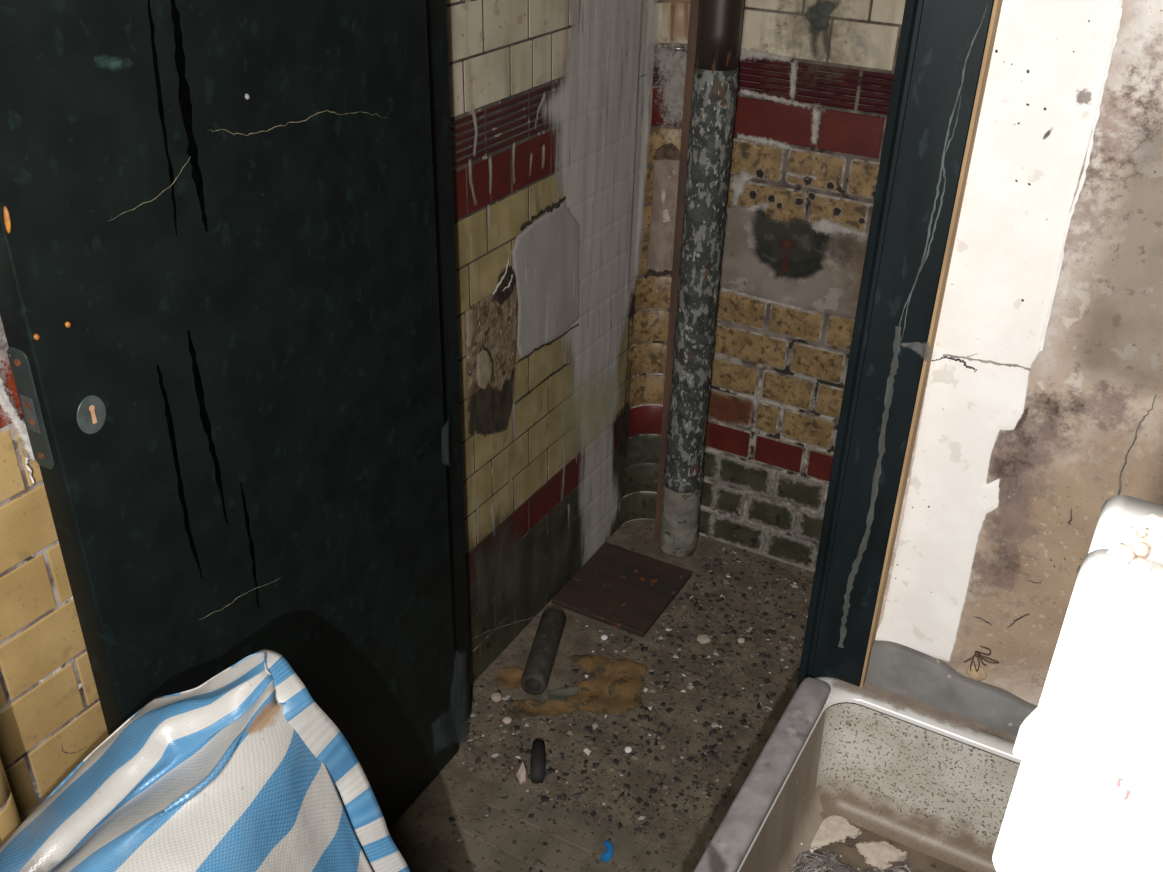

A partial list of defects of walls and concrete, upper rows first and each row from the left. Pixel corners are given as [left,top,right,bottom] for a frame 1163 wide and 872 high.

crack [148,0,207,235]
crack [156,330,259,608]
spalling [464,260,579,435]
spalling [520,196,565,232]
damp [469,0,687,610]
crack [838,7,987,648]
crack [931,353,1031,373]
peeling [875,0,1123,662]
damp [949,382,1163,676]
damp [1064,39,1163,251]
crack [1118,394,1157,495]